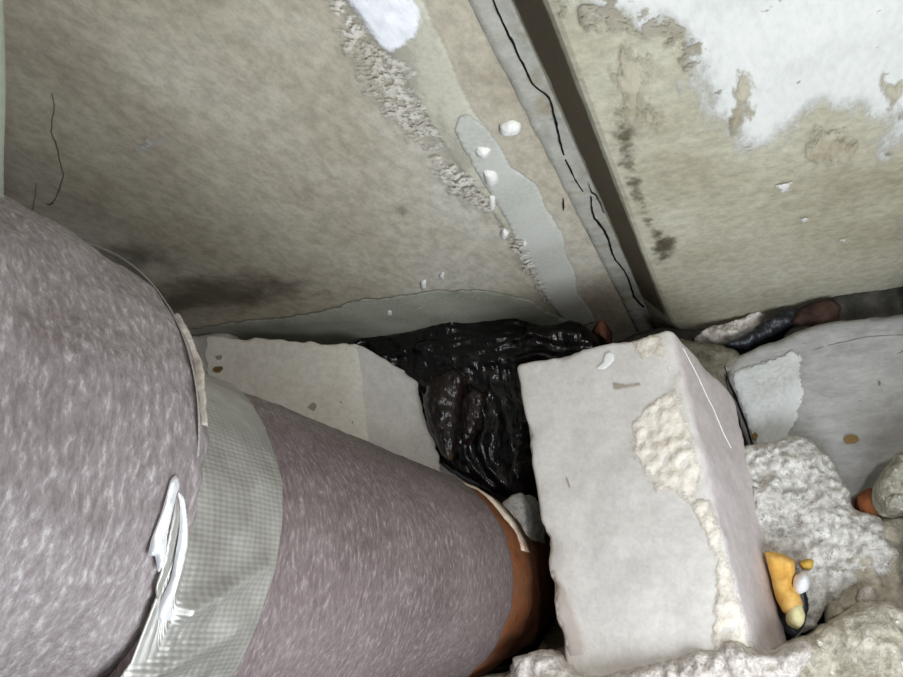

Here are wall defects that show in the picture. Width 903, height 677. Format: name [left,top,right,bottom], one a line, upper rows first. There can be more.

crack [32,95,64,209]
efflorescence [330,0,495,212]
damp [514,0,665,315]
peeling [557,0,903,164]
damp [166,282,261,309]
damp [654,232,675,260]